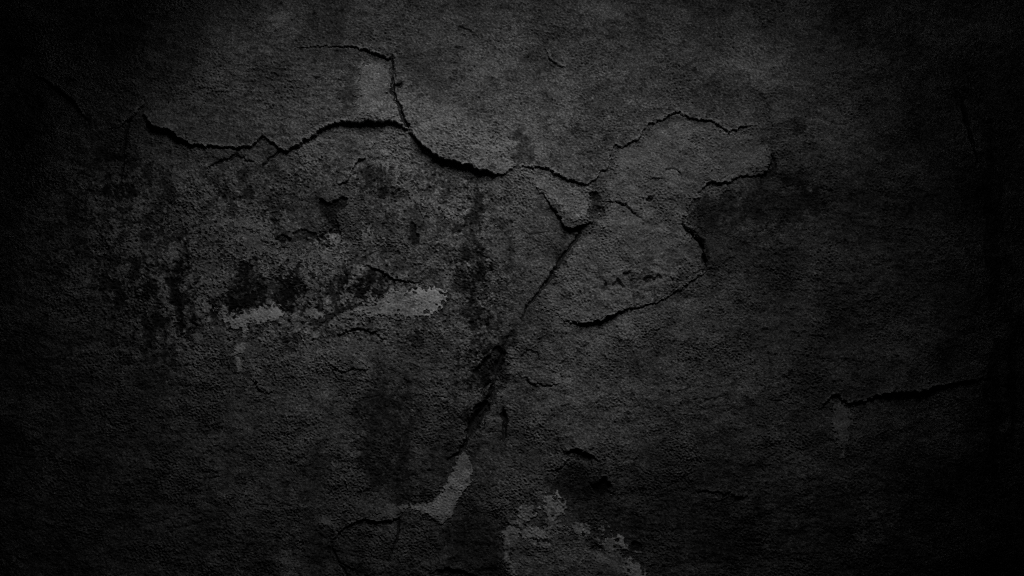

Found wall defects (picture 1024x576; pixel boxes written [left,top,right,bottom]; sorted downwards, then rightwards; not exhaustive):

crack [389,56,410,134]
crack [207,149,281,169]
crack [682,224,708,272]
crack [447,233,581,460]